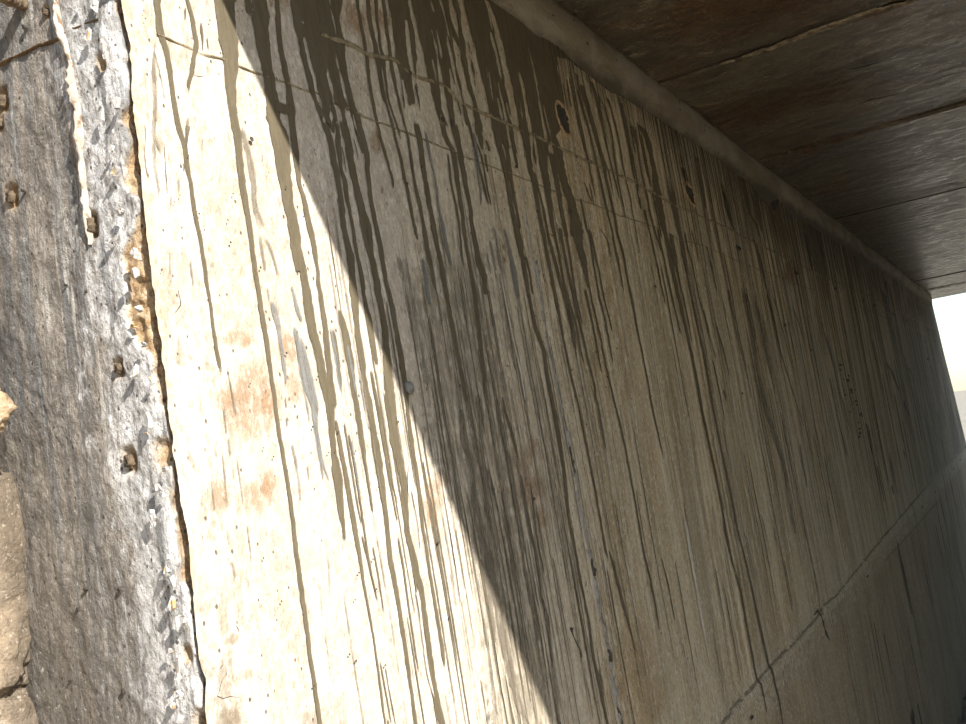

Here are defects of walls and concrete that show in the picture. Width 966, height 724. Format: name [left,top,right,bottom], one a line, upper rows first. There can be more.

water stain [145,0,237,482]
water stain [215,0,966,724]
crack [634,184,642,209]